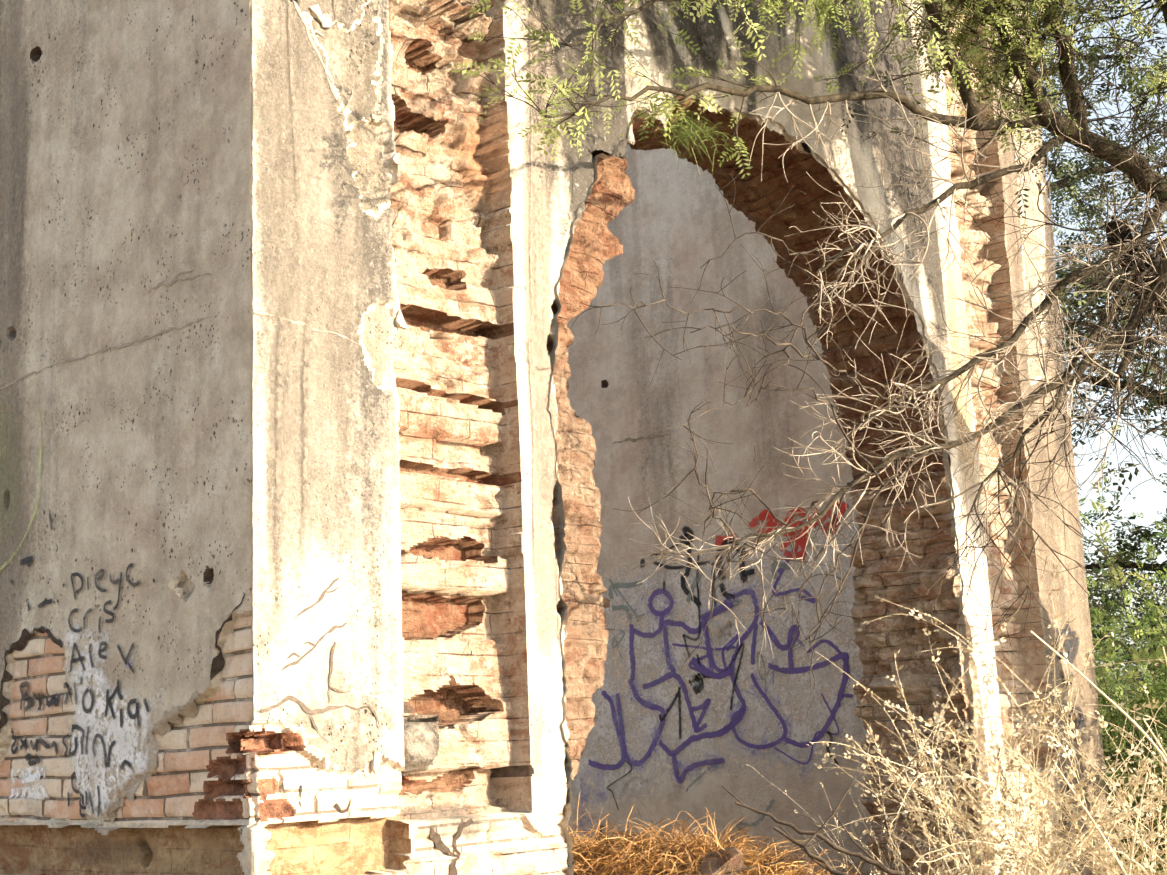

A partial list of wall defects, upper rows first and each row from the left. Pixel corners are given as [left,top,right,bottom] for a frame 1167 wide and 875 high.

water stain [0,1,27,661]
spalling [0,0,568,875]
water stain [259,0,361,562]
spalling [553,155,635,780]